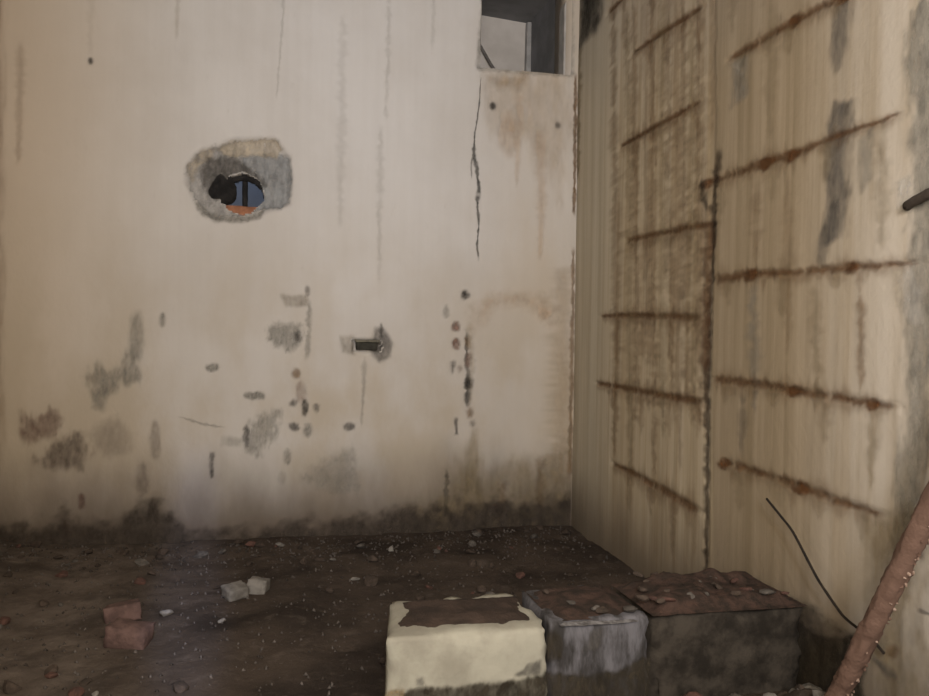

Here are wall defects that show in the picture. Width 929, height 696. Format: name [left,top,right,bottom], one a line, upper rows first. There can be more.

rust [637,8,700,51]
rust [734,0,847,57]
rust [623,103,698,146]
spalling [187,139,292,221]
crack [472,83,481,256]
rust [742,144,817,172]
rust [629,223,713,241]
rust [829,262,902,272]
rust [599,382,696,402]
rust [718,379,888,410]
damp [0,499,245,545]
damp [263,499,571,538]